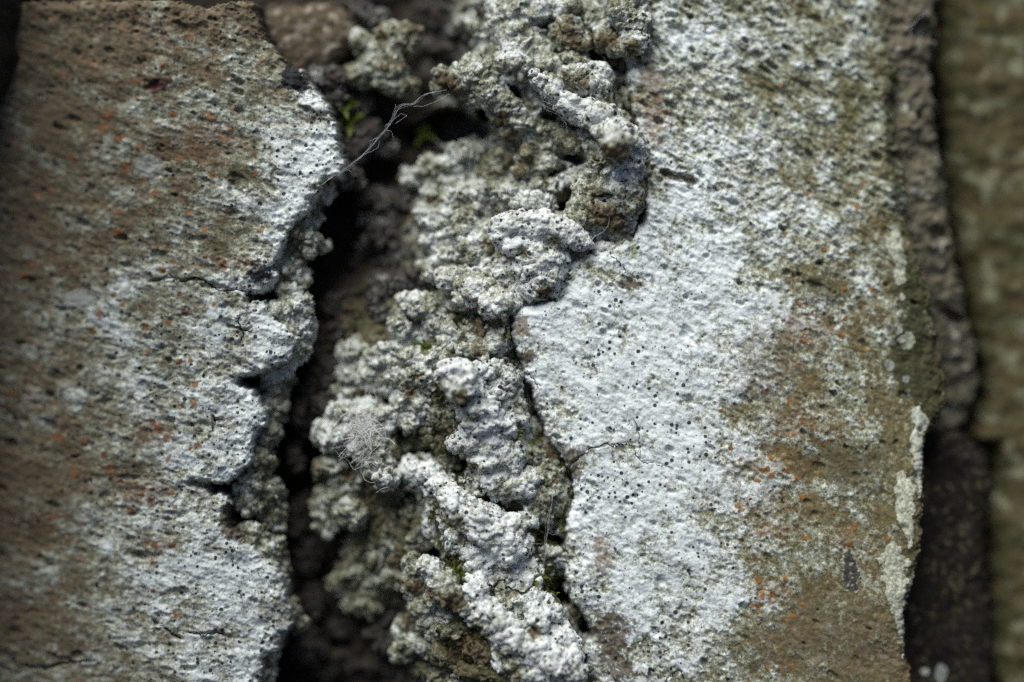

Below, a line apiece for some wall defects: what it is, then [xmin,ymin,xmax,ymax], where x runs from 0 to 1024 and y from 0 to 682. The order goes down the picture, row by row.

crack [149,274,251,294]
crack [229,317,253,340]
leakage [518,349,535,363]
leakage [549,432,584,482]
peeling [875,403,930,659]
leakage [588,536,612,577]
leakage [589,602,648,682]